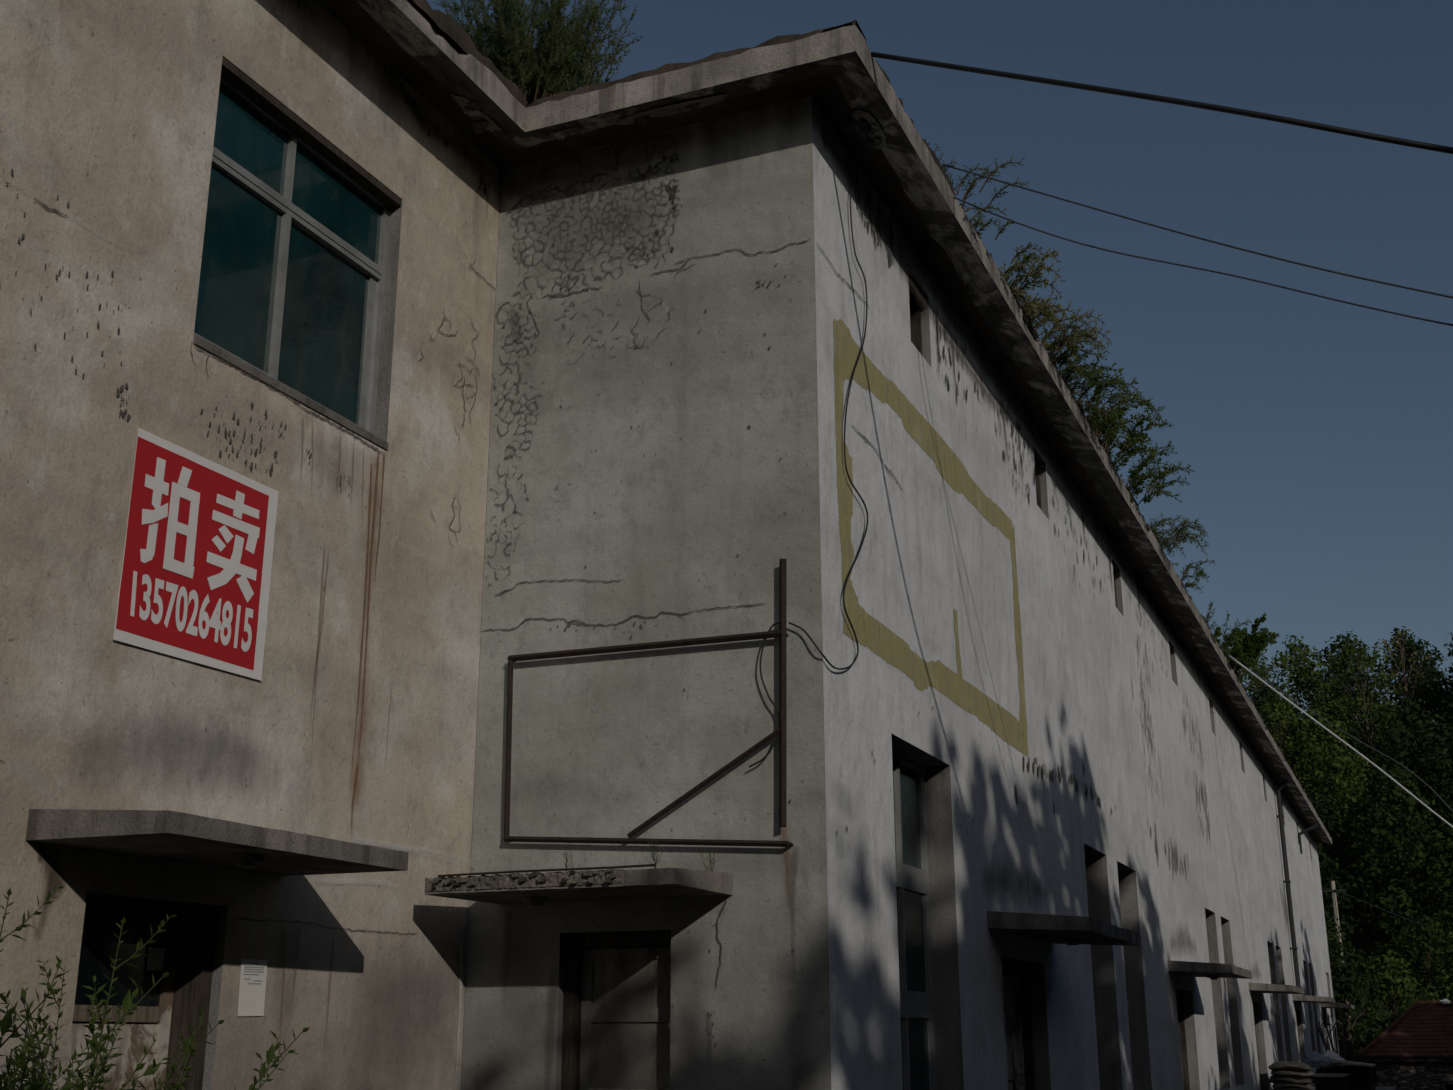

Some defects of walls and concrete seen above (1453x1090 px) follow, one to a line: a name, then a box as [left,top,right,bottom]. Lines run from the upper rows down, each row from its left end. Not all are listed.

rust [355,454,385,732]
crack [419,150,870,632]
crack [851,424,903,490]
damp [824,134,1022,468]
spalling [425,864,655,892]